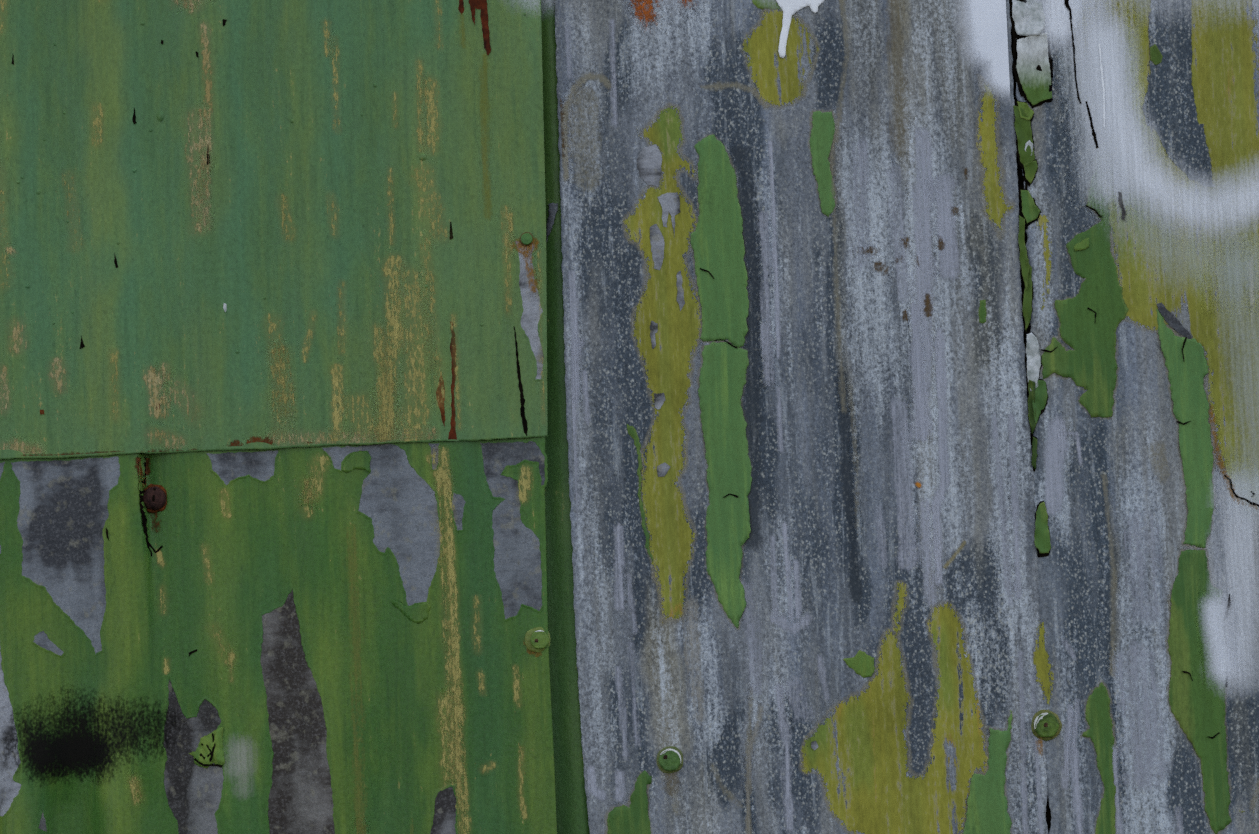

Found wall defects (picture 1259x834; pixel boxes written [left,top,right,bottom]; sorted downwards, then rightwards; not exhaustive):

rust [457,0,493,57]
rust [632,0,656,22]
crack [1009,0,1105,148]
crack [1016,152,1031,398]
peeling [1010,0,1129,472]
rust [435,320,459,441]
crack [514,327,528,436]
peeling [676,135,752,629]
peeling [0,456,123,658]
peeling [323,443,468,606]
peeling [1156,302,1232,834]
crack [1045,792,1053,834]